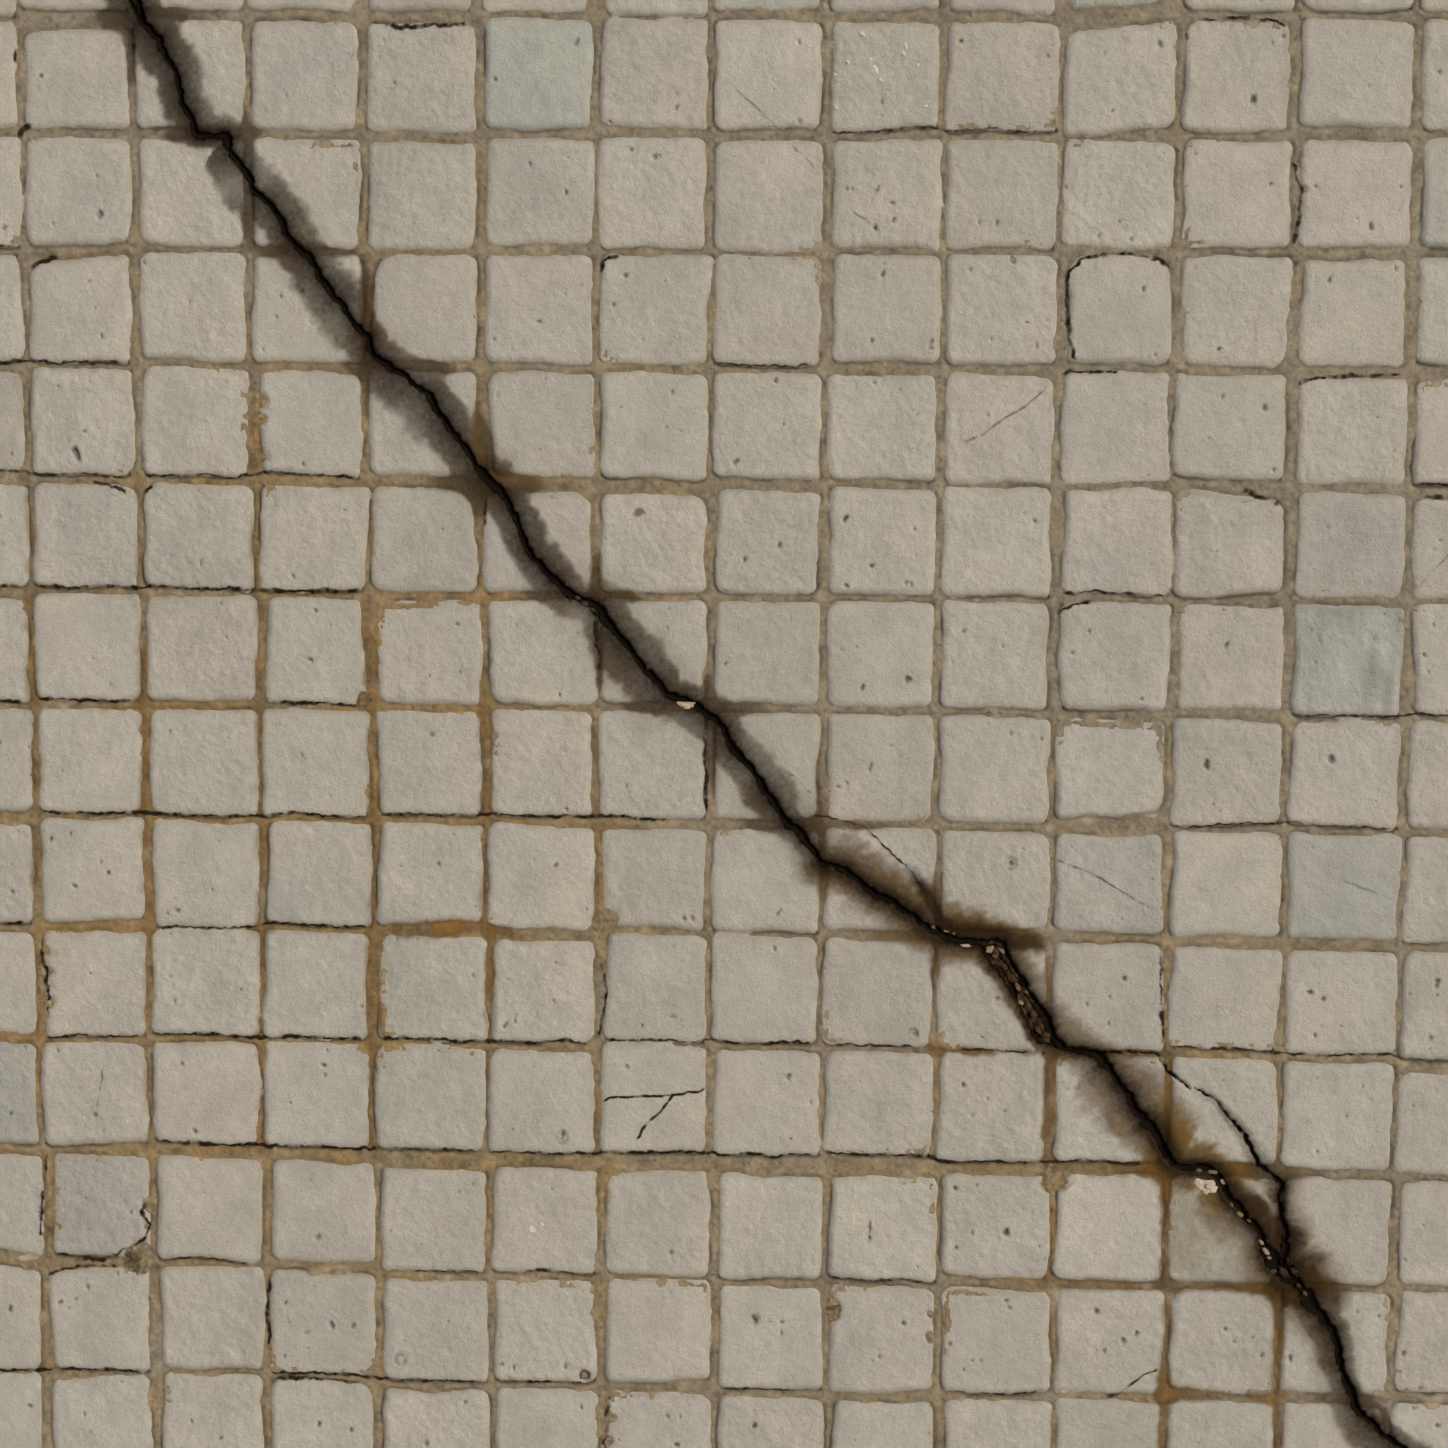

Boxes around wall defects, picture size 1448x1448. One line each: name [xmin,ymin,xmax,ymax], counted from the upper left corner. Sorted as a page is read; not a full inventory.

crack [1064,252,1169,375]
crack [0,469,353,493]
damp [97,0,828,848]
crack [2,584,357,594]
crack [45,810,665,821]
crack [7,921,912,1047]
crack [162,1140,376,1151]
crack [403,1088,1140,1166]
crack [39,1157,151,1275]
crack [0,1365,138,1373]
crack [174,1256,479,1383]
damp [1280,1284,1425,1448]